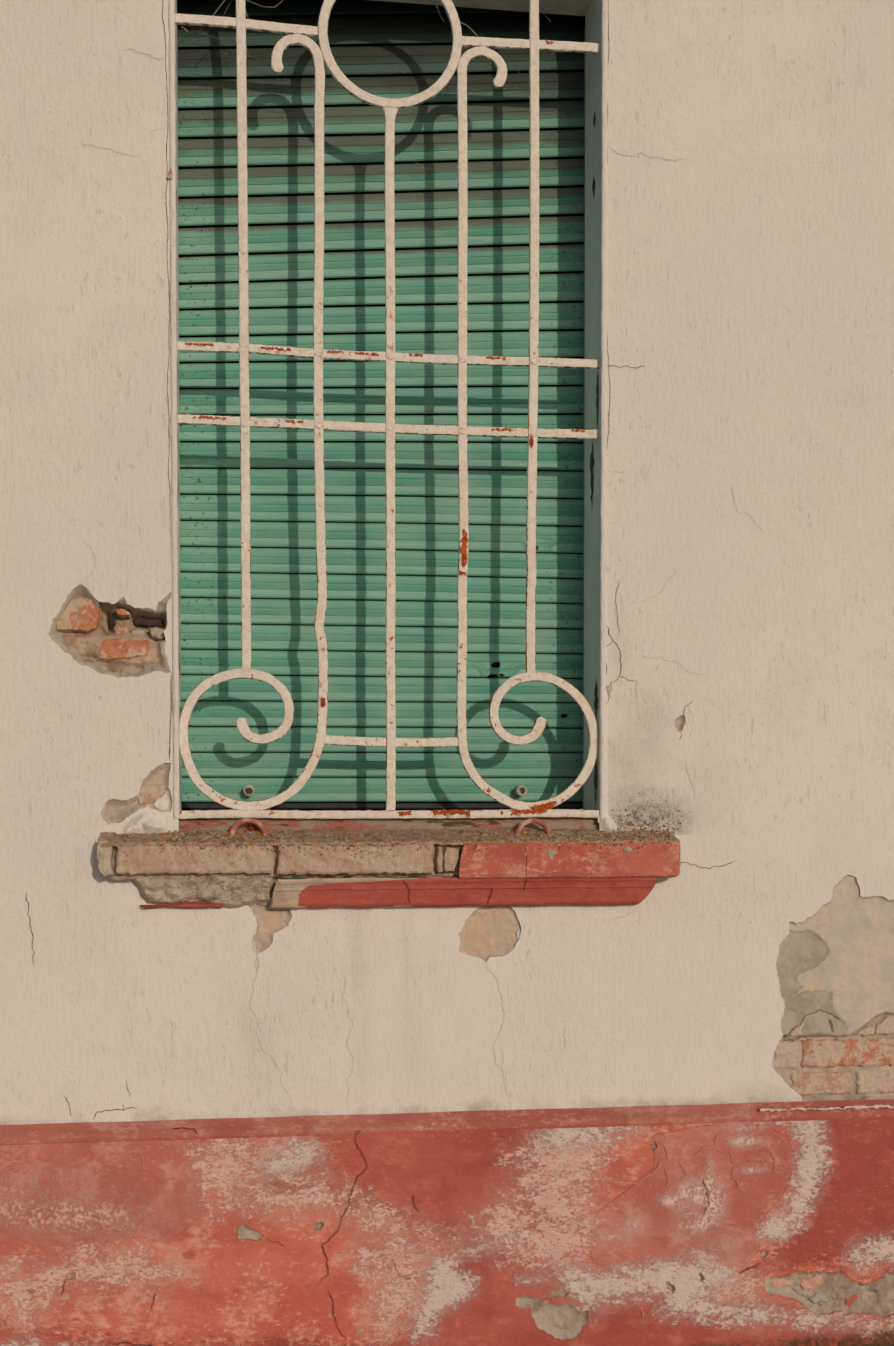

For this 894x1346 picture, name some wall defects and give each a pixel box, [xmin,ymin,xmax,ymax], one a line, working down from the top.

crack [83,0,172,590]
rust [459,528,469,576]
spalling [48,576,180,678]
spalling [101,763,172,825]
crack [26,892,35,967]
crack [249,935,294,1114]
crack [486,967,512,1109]
crack [318,975,368,1338]
spalling [183,875,894,1344]
peeling [0,1237,209,1346]